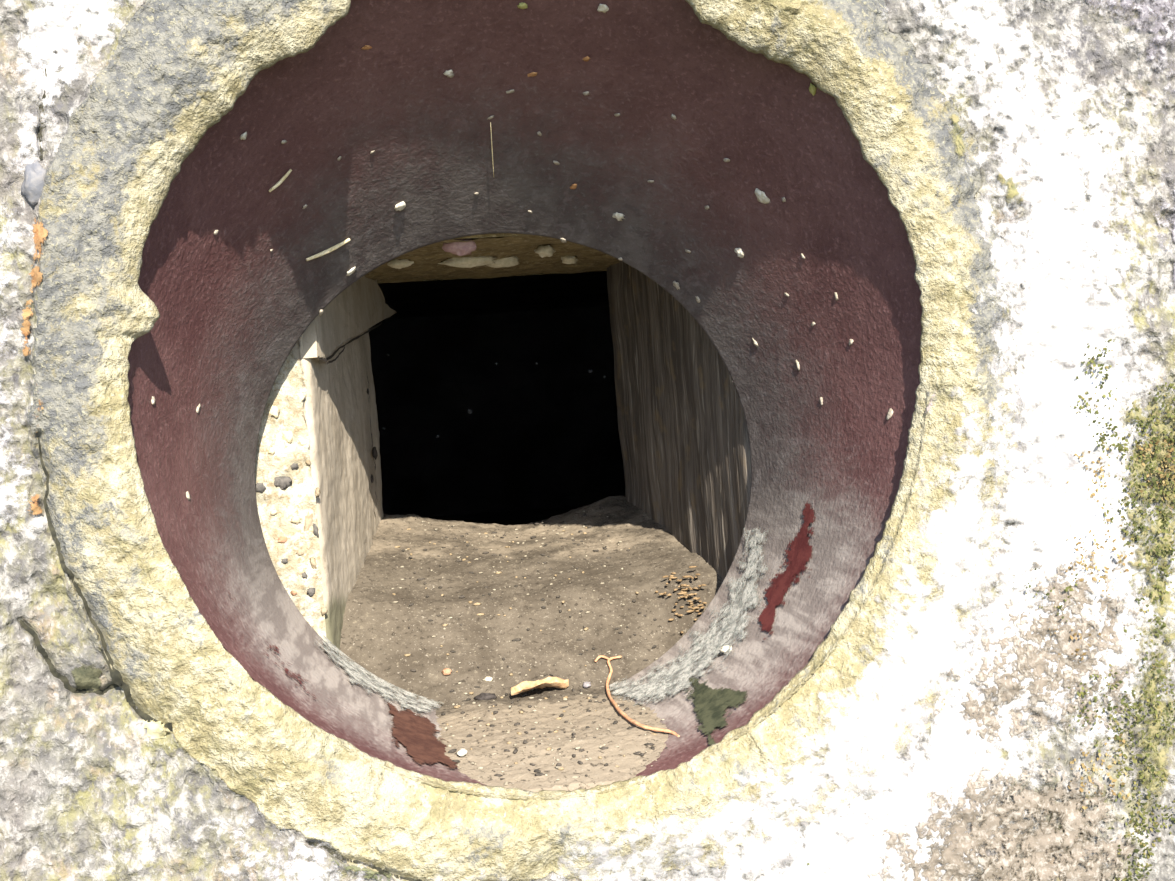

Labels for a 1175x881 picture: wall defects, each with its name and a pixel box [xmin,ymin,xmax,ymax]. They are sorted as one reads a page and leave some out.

crack [37,68,48,160]
crack [19,436,173,731]